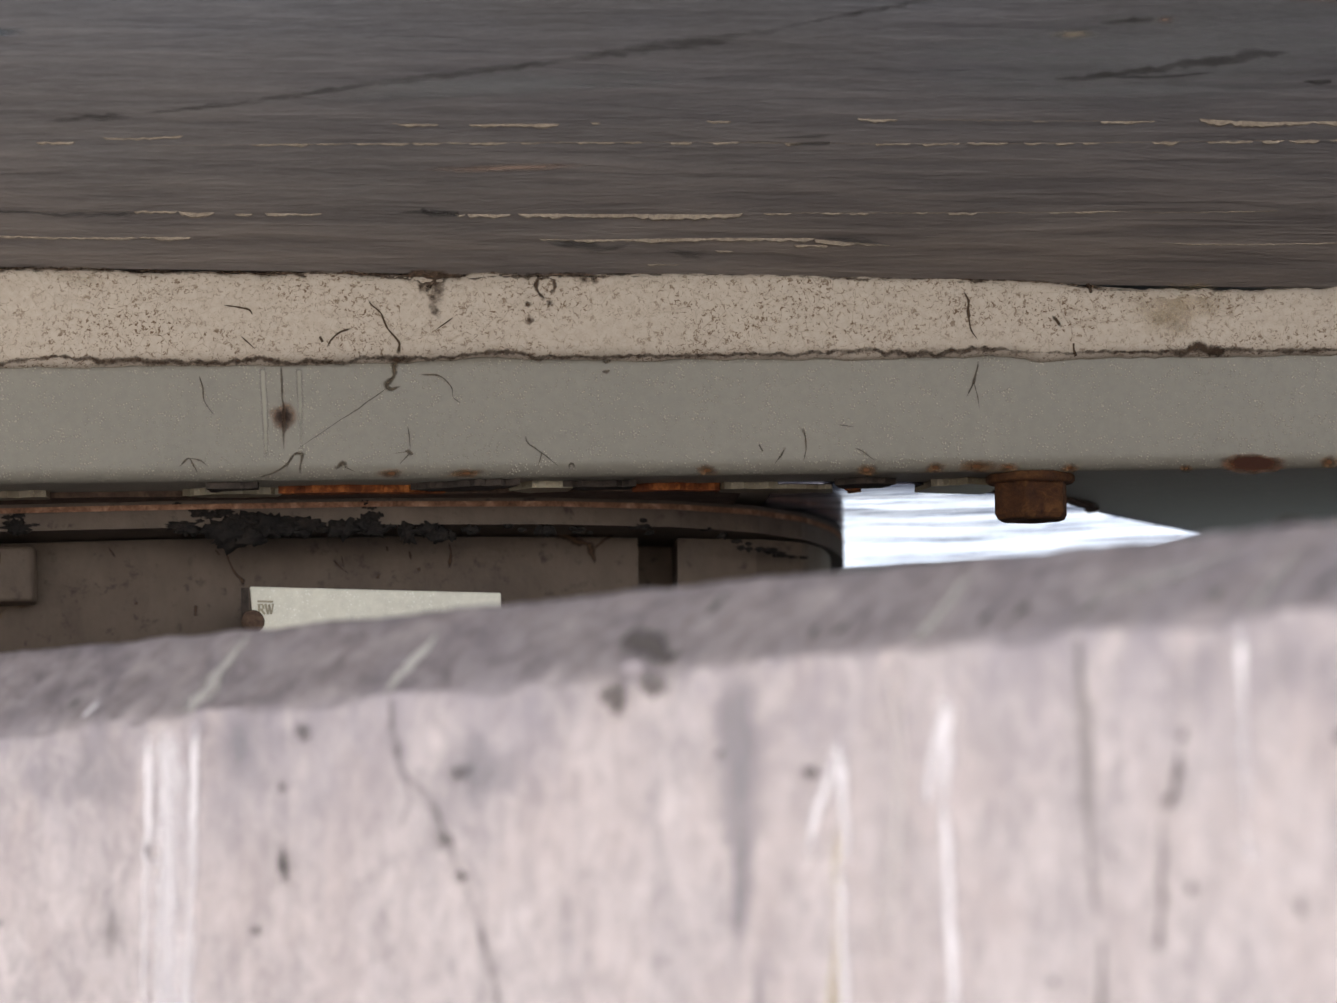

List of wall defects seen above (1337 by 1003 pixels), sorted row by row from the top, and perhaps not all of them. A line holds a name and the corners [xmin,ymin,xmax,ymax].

rust [274,407,292,427]
rust [1225,455,1281,473]
damp [144,734,199,964]
damp [809,745,849,1003]